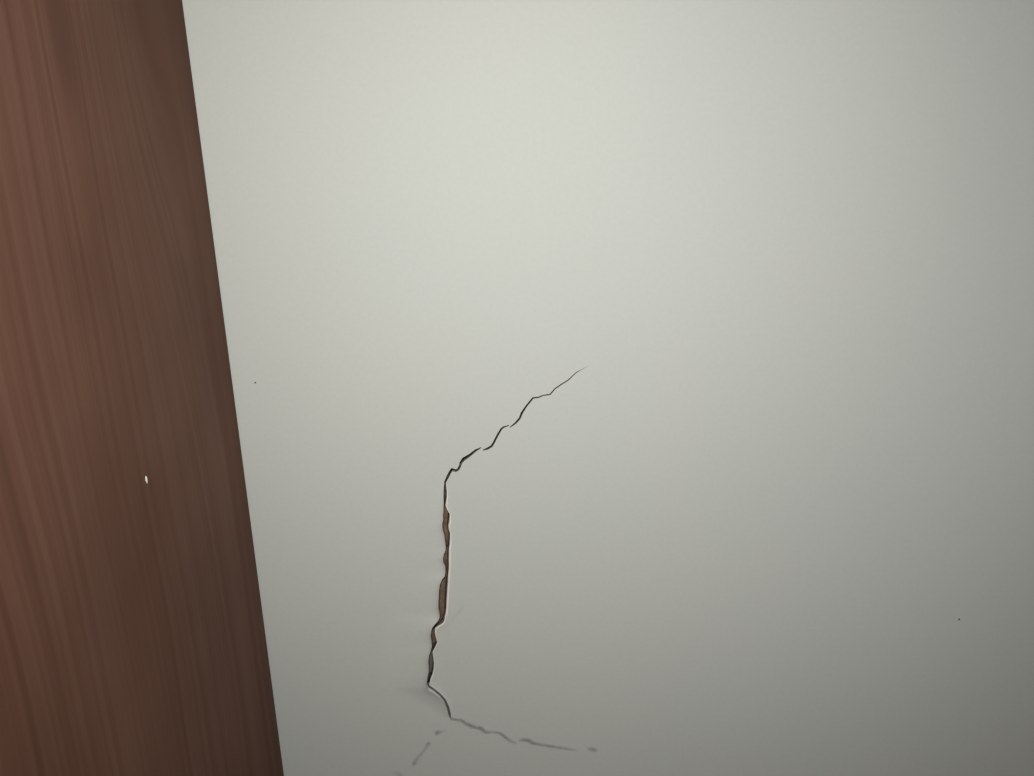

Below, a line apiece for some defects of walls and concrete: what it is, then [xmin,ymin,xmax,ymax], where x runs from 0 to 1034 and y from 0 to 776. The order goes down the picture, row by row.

crack [380,366,588,718]